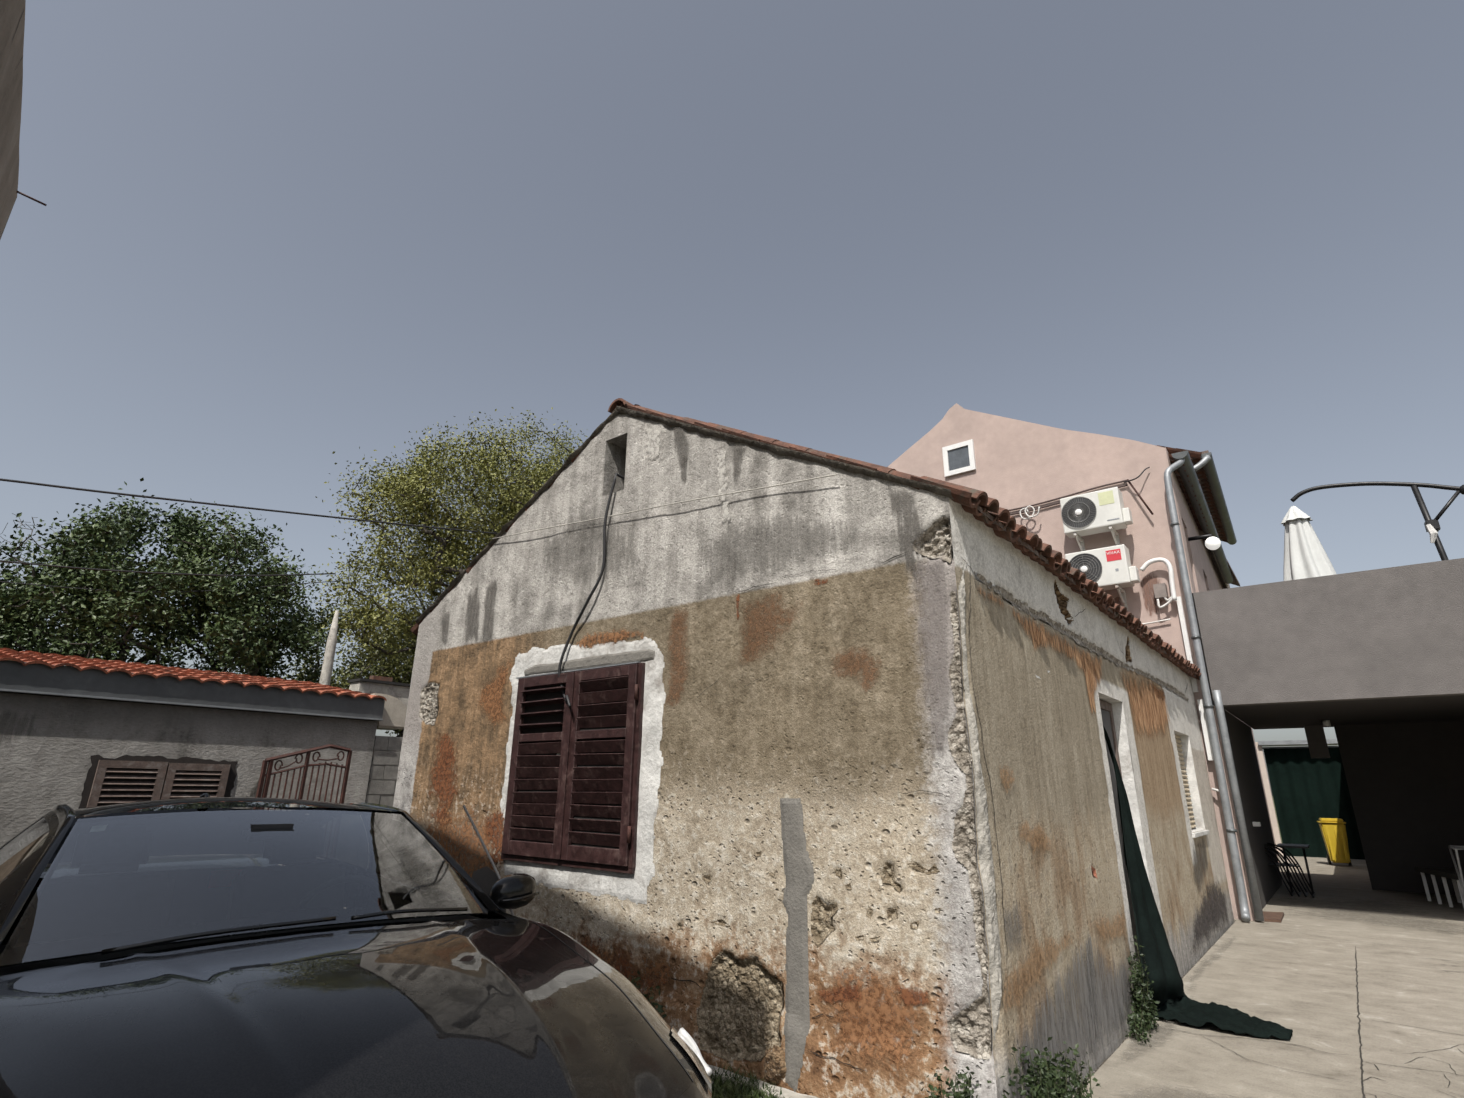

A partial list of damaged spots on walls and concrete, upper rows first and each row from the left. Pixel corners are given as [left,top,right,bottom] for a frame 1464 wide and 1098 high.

water stain [645,426,688,481]
flaking render [912,517,952,563]
water stain [442,580,496,643]
rust [1122,674,1170,737]
rust [425,733,505,883]
spalling [947,591,992,1059]
flaking render [855,861,940,942]
water stain [1193,841,1229,952]
rust [571,932,671,996]
flaking render [697,950,783,1061]
rust [818,965,929,1076]
crack [1161,1020,1463,1098]